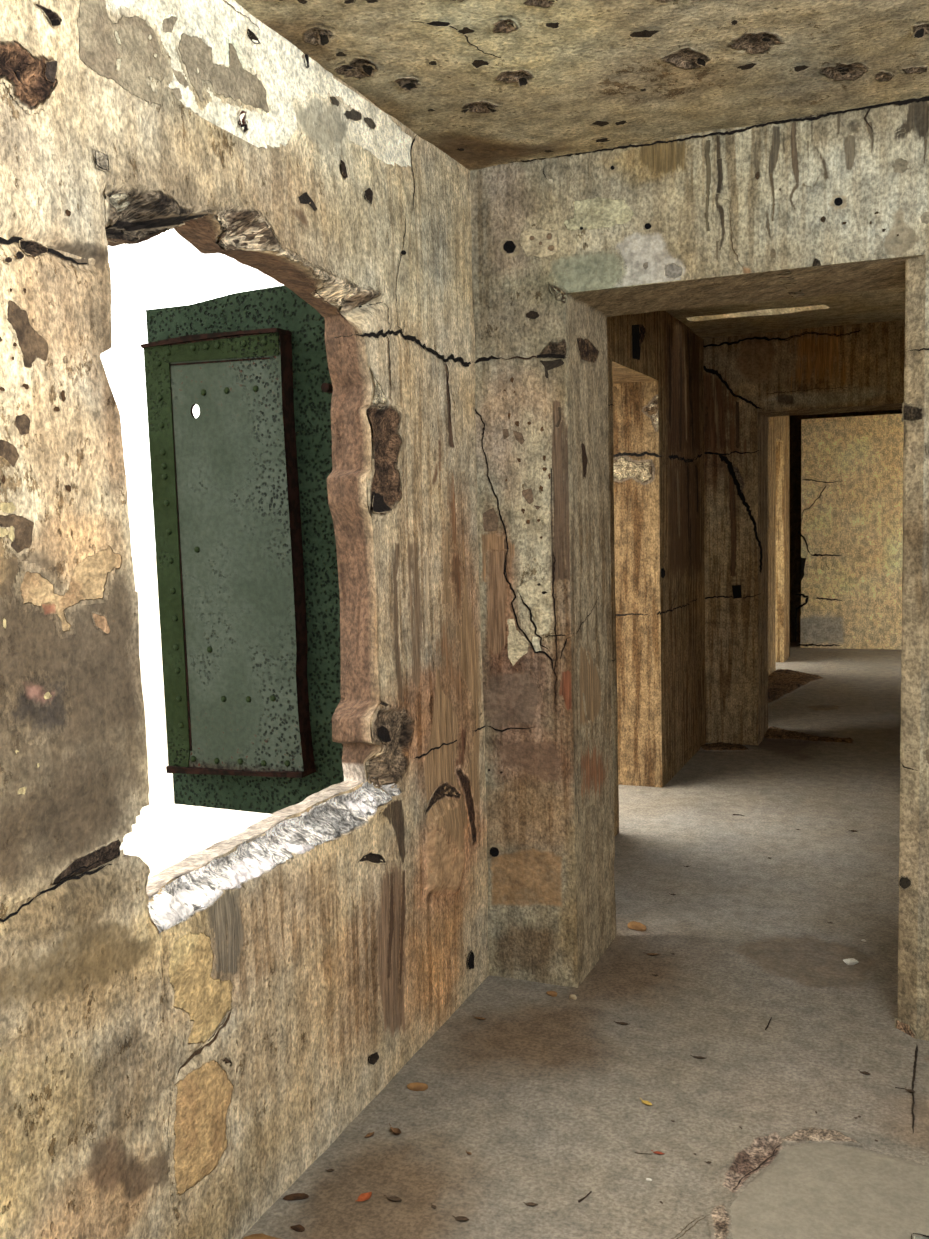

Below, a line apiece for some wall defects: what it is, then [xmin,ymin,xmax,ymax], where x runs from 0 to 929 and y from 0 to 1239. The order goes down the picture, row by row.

spalling [0,35,59,115]
crack [0,235,109,275]
flaking render [34,0,271,118]
water stain [630,134,726,260]
crack [510,96,929,184]
spalling [657,19,790,71]
water stain [752,120,831,240]
water stain [837,98,929,170]
spalling [367,366,404,521]
crack [335,135,763,706]
water stain [0,526,149,904]
crack [0,838,122,922]